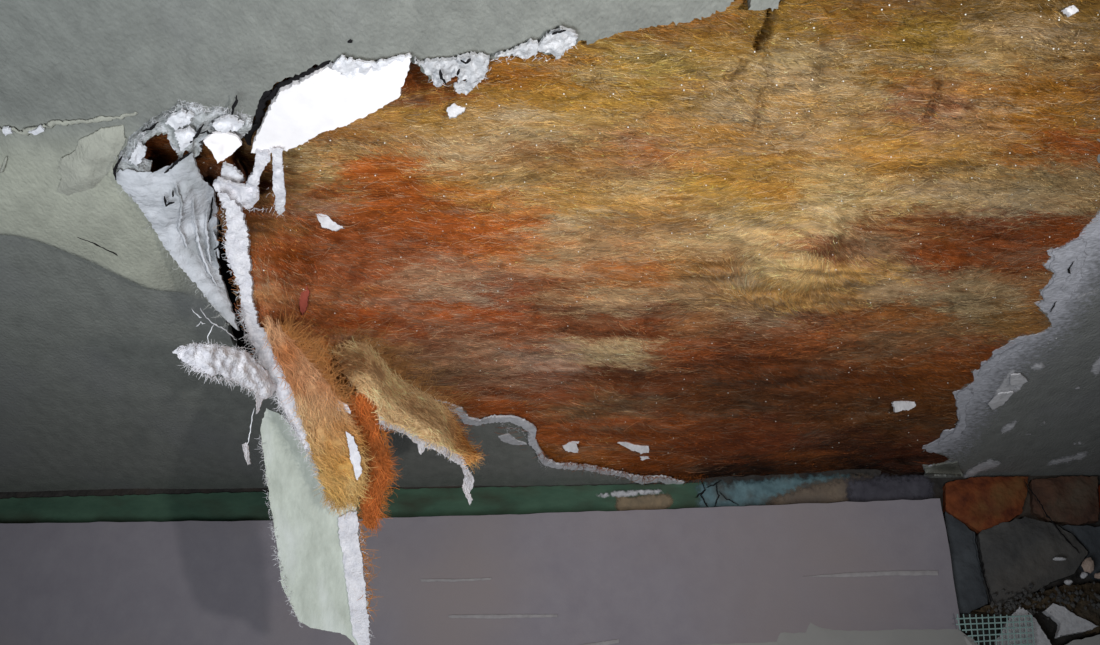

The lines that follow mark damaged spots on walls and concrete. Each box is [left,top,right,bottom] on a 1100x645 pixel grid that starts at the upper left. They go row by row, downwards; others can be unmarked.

spalling [1062,5,1079,17]
spalling [446,103,466,119]
flaking render [113,53,412,218]
spalling [315,213,344,231]
peeling [987,363,1045,410]
spalling [891,401,916,412]
peeling [498,433,528,445]
spalling [562,441,579,453]
spalling [617,442,650,461]
flaking render [601,490,673,511]
crack [1024,480,1079,552]
crack [975,532,991,601]